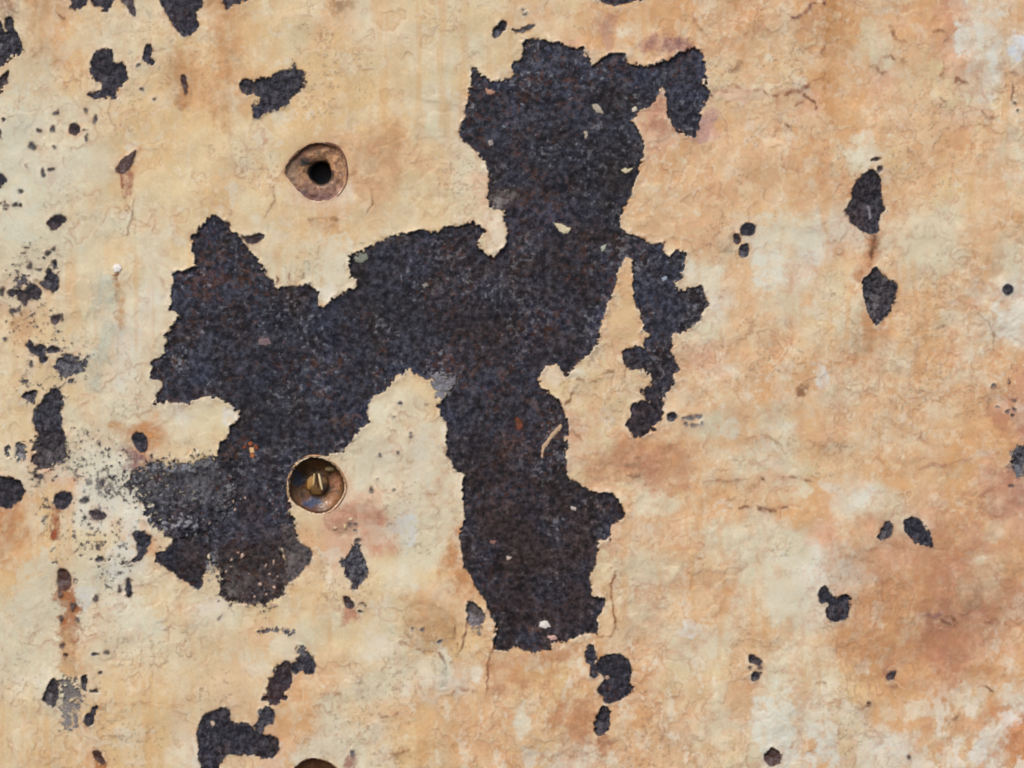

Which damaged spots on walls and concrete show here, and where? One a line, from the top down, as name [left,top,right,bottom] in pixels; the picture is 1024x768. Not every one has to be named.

peeling [845,158,885,234]
peeling [862,267,898,326]
peeling [0,9,712,736]
peeling [878,517,933,548]
corrosion [57,569,82,676]
peeling [818,586,851,622]
peeling [196,626,316,768]